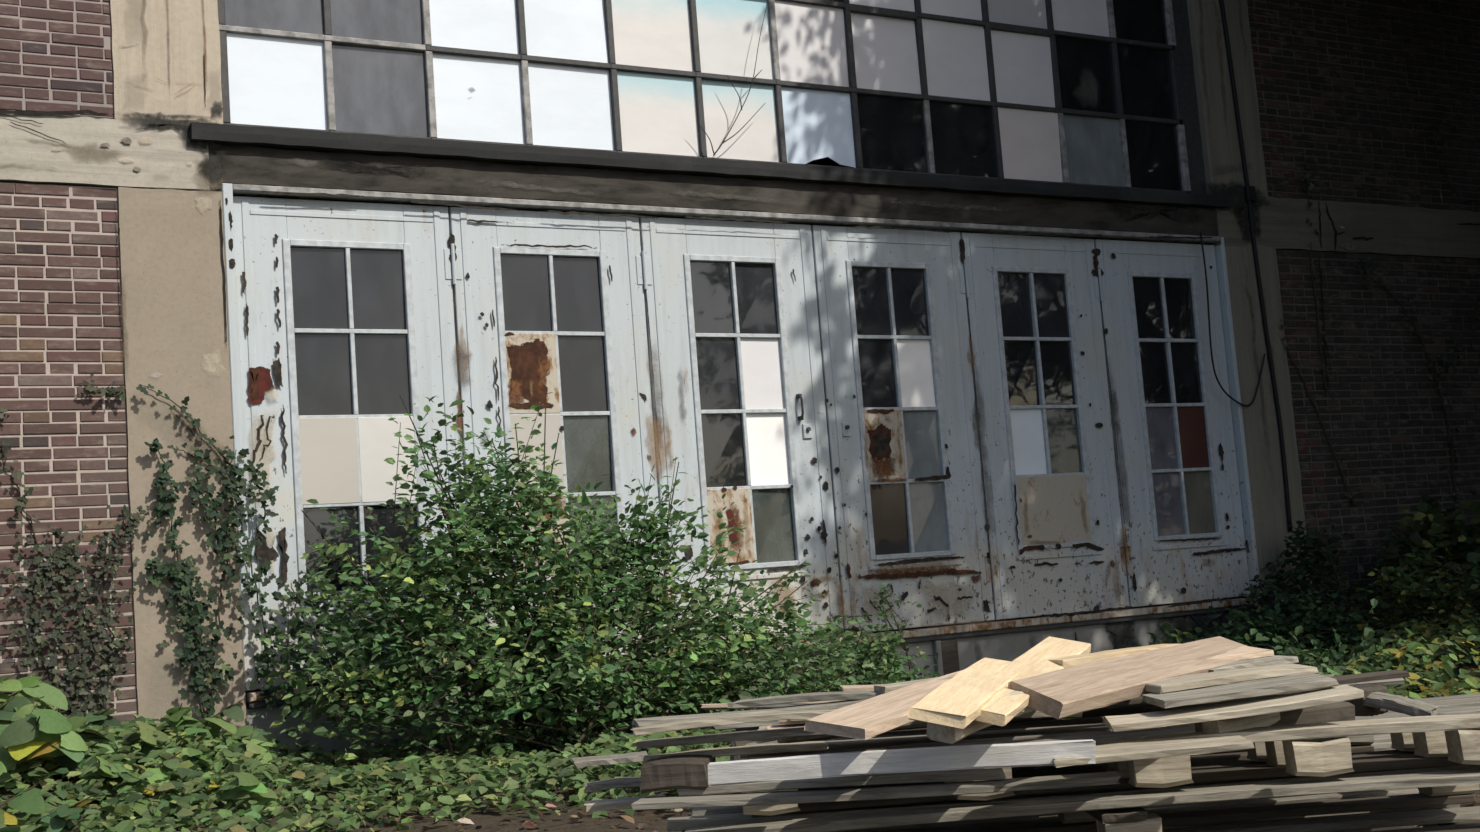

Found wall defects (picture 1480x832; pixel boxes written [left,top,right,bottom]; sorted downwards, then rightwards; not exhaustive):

damp [125,102,226,188]
corrosion [504,332,554,409]
corrosion [767,239,991,637]
corrosion [1010,248,1137,617]
corrosion [717,486,750,566]
spalling [803,517,841,573]
peeling [847,575,991,635]
corrosion [1168,587,1240,608]